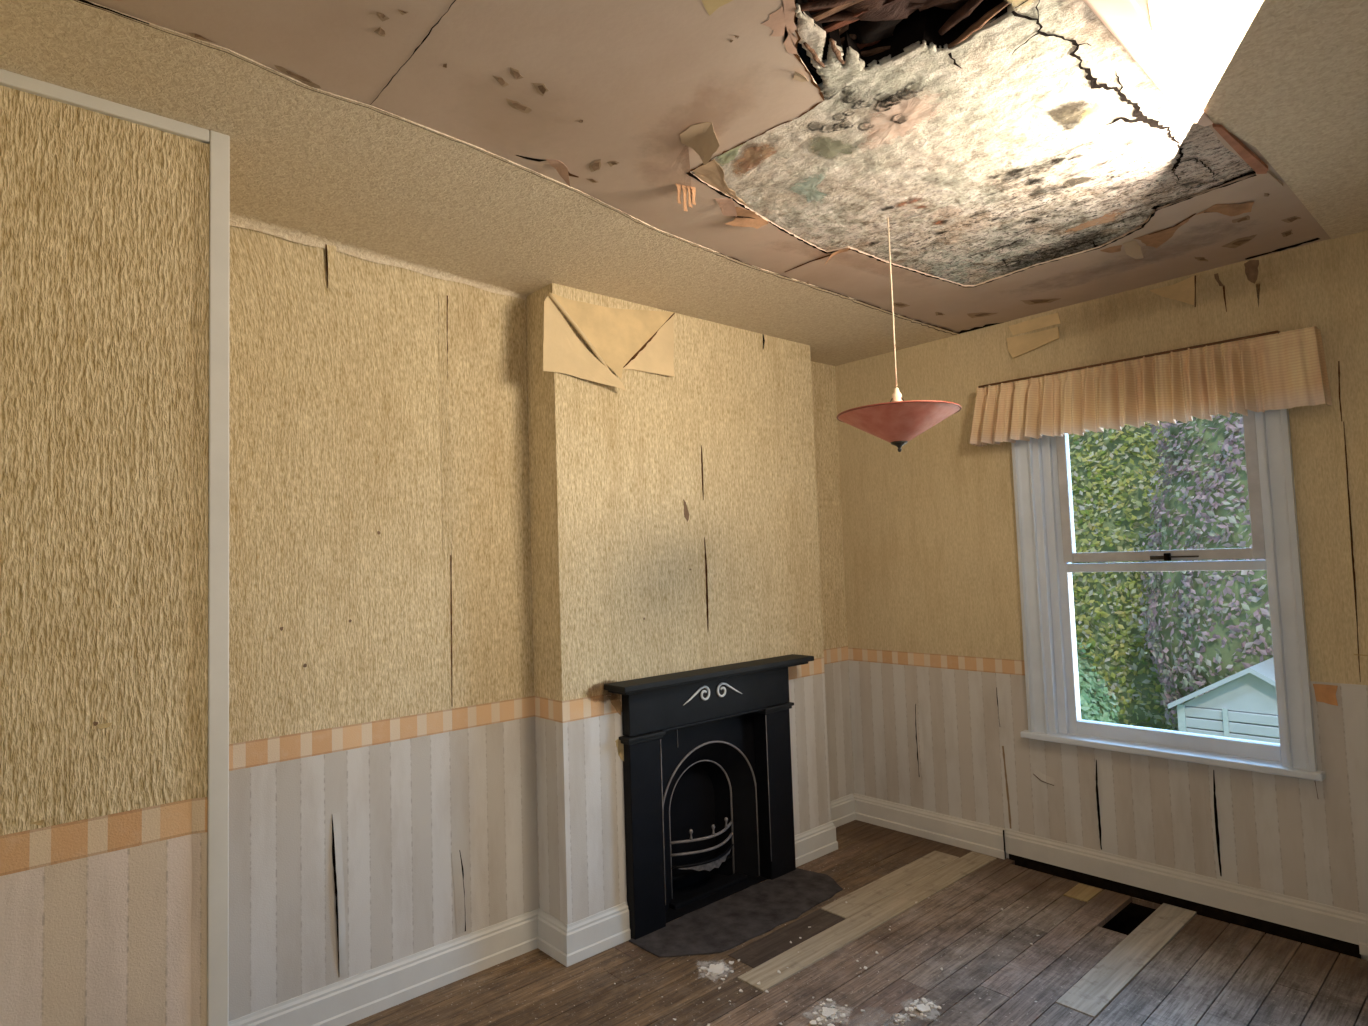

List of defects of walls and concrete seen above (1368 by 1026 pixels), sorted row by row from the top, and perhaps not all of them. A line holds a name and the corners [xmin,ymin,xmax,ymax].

crack [370,0,456,105]
peeling [493,67,549,114]
peeling [587,159,619,183]
flaking render [680,0,1269,288]
crack [1011,0,1215,183]